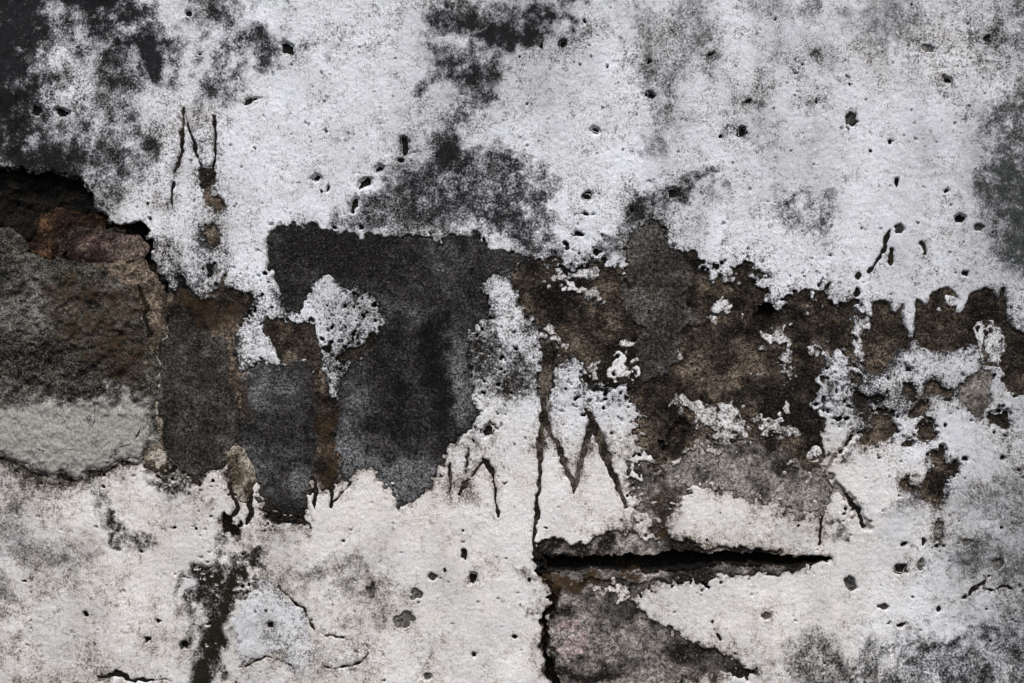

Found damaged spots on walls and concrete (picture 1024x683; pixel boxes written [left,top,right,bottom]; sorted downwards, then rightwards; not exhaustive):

water stain [0,0,284,210]
water stain [331,0,730,270]
flaking render [0,165,1024,683]
crack [532,548,832,683]